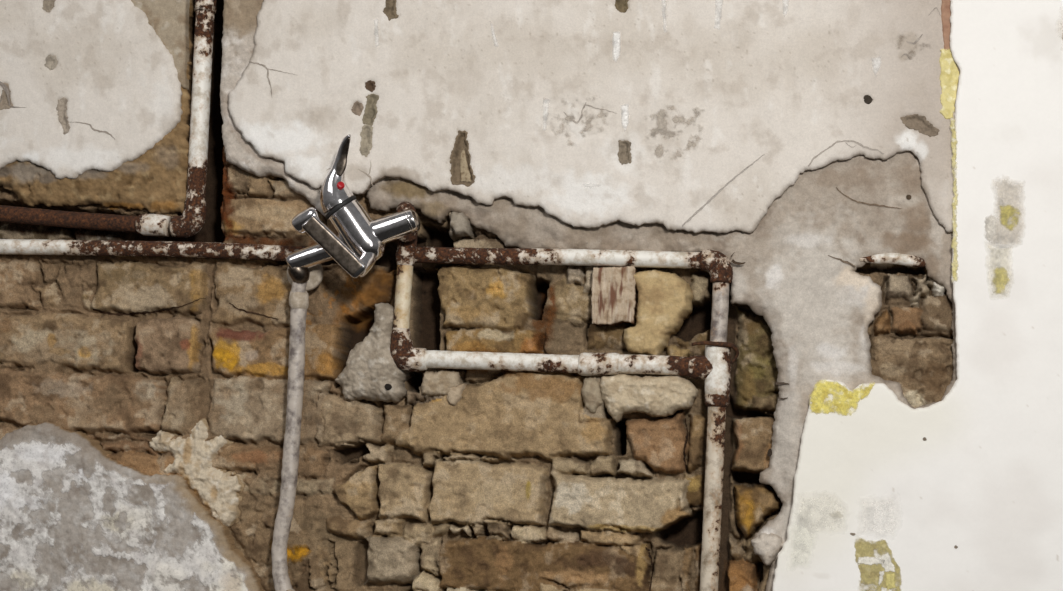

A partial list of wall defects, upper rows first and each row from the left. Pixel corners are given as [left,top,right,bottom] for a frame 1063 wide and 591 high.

crack [0,82,26,108]
crack [76,122,115,139]
flaking render [0,0,337,247]
crack [250,61,294,97]
crack [808,140,884,166]
crack [682,154,765,226]
flaking render [351,0,960,591]
flaking render [0,254,292,591]
flaking render [287,239,708,591]